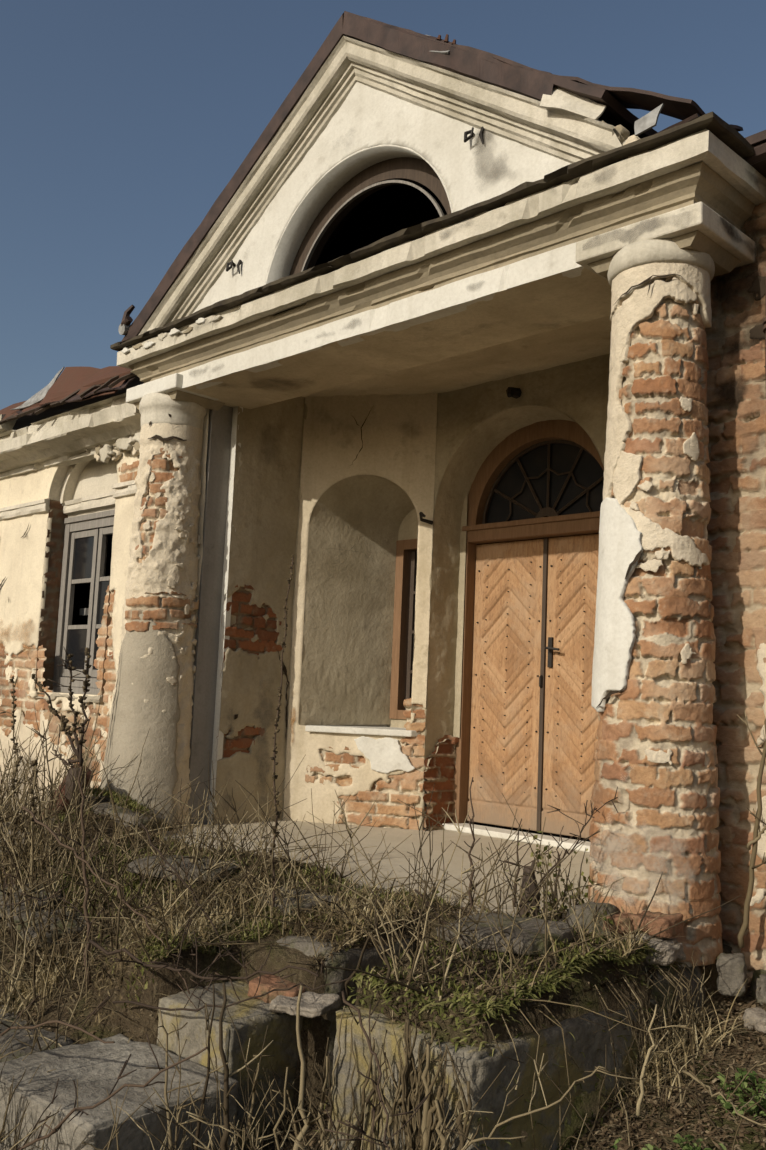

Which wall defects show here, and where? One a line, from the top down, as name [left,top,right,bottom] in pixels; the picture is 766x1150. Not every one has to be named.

flaking render [119,448,201,563]
flaking render [591,262,712,712]
flaking render [0,563,199,789]
flaking render [216,714,265,758]
flaking render [220,584,282,674]
flaking render [305,698,459,831]
flaking render [644,749,672,765]
flaking render [755,643,766,746]
flaking render [756,796,766,865]
flaking render [750,883,766,906]